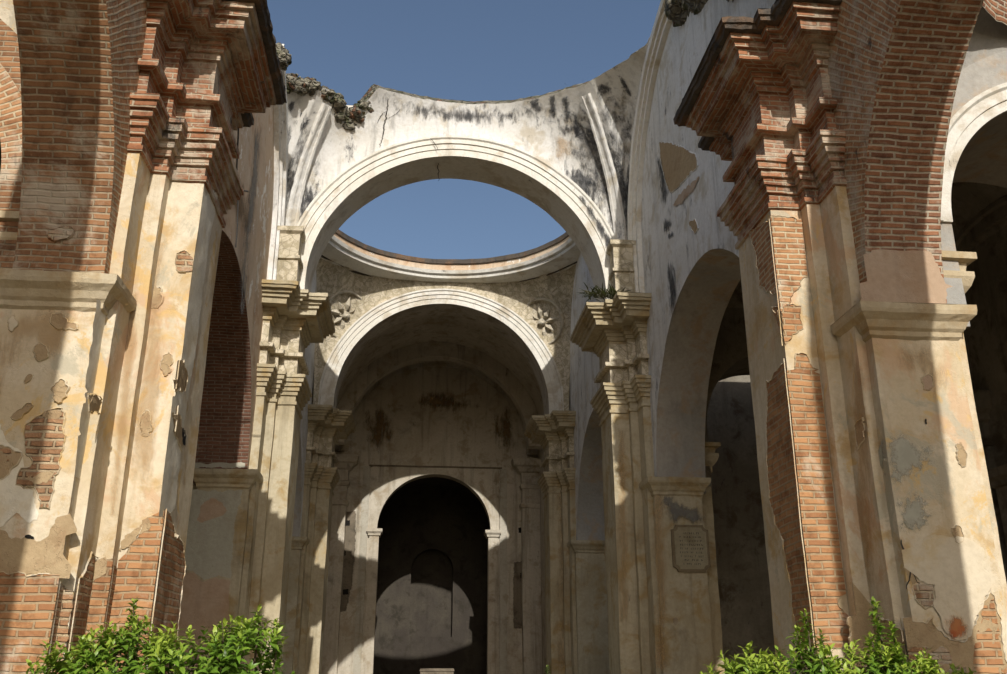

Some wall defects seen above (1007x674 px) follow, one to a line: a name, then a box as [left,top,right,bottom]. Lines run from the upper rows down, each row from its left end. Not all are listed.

water stain [416,106,516,122]
water stain [527,79,632,246]
flaking render [175,250,193,274]
flaking render [749,215,808,346]
flaking render [0,378,71,509]
peeling [160,352,188,393]
flaking render [171,405,186,452]
flaking render [765,352,1007,674]
flaking render [0,509,186,674]